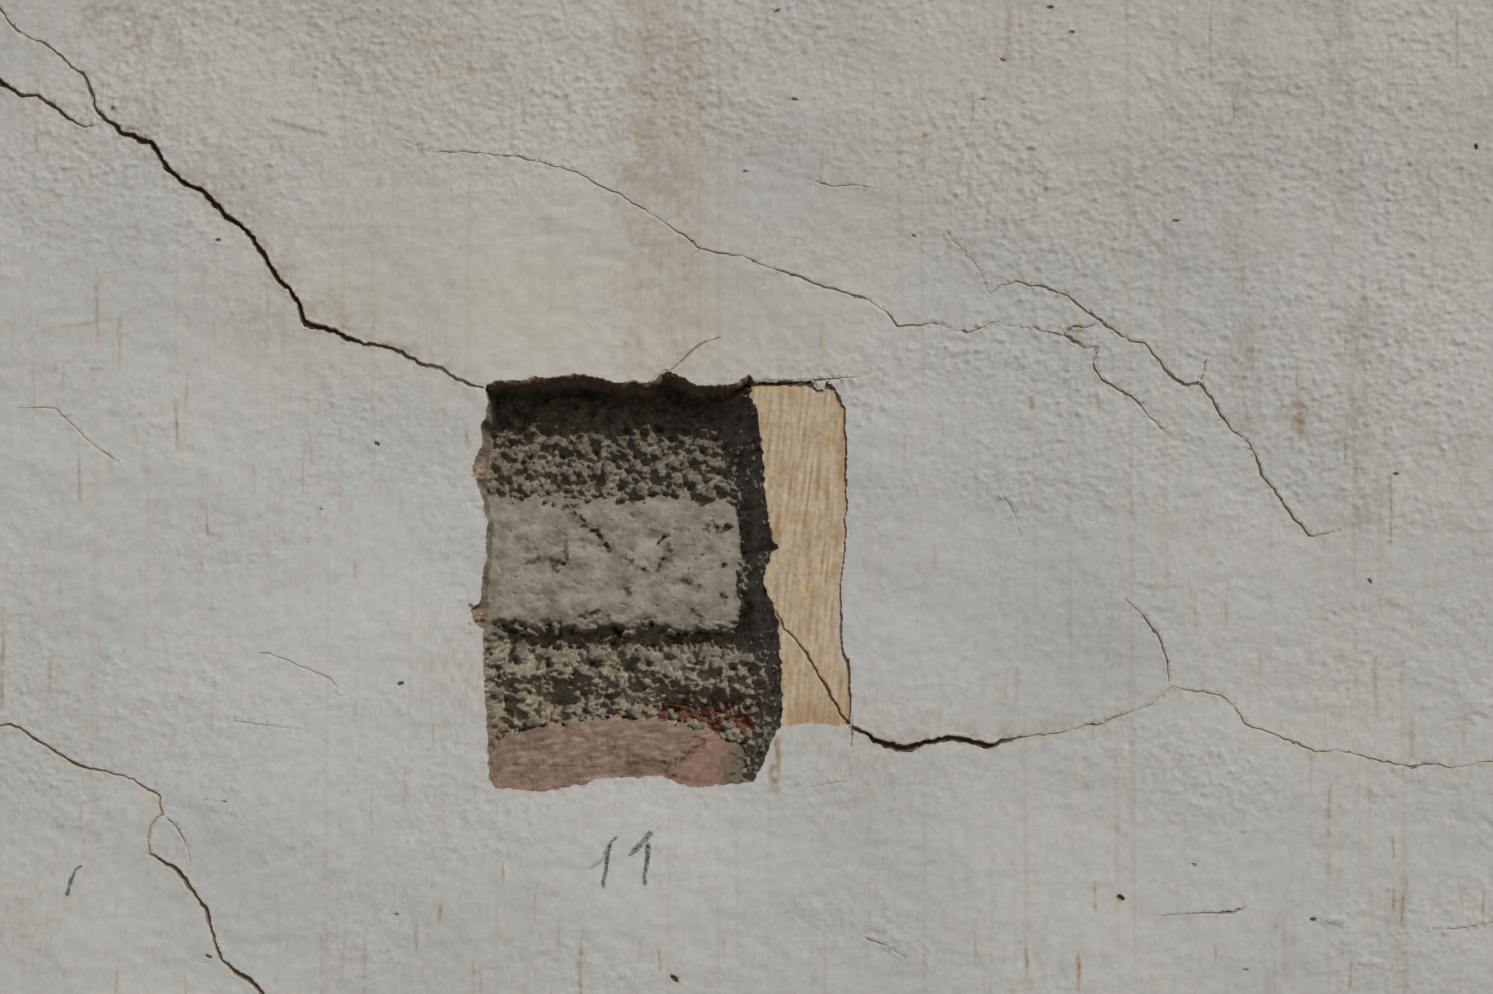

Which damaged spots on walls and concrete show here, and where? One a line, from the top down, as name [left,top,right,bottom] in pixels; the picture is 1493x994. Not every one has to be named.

crack [0,1,486,393]
crack [400,137,1346,542]
crack [0,718,270,994]
crack [255,648,346,697]
spalling [467,370,852,793]
crack [774,592,1493,774]